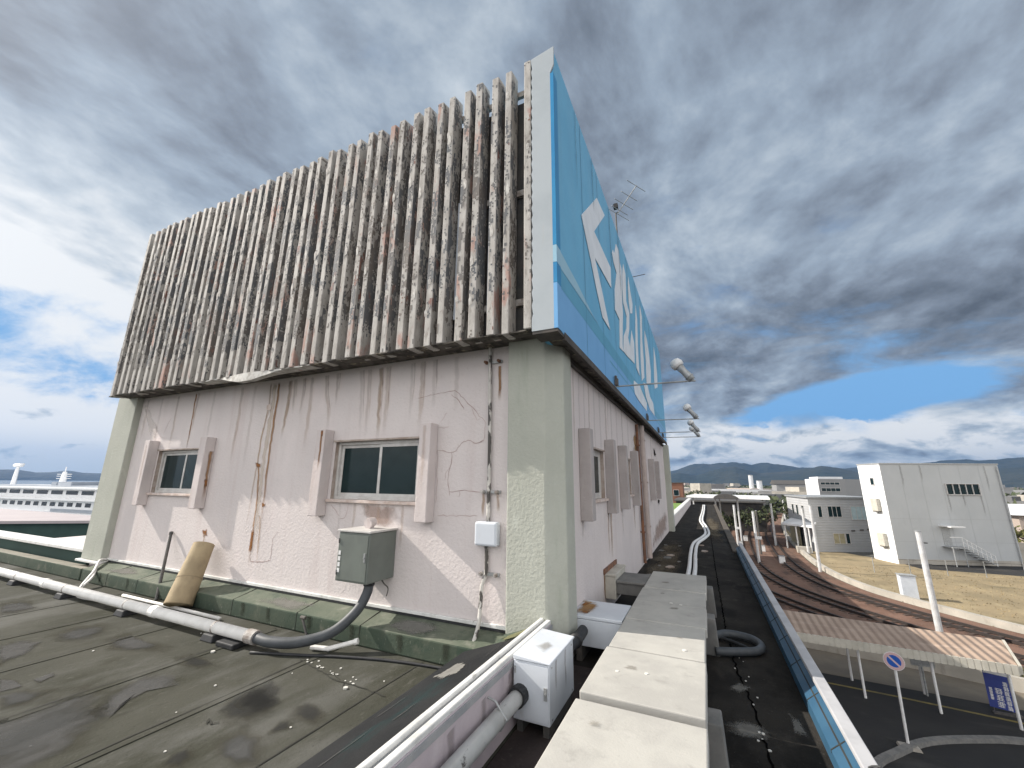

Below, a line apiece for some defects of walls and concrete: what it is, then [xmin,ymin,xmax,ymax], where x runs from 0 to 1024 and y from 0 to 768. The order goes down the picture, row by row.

peeling [116,80,533,393]
rust [249,384,290,550]
crack [421,390,486,517]
crack [710,532,774,768]